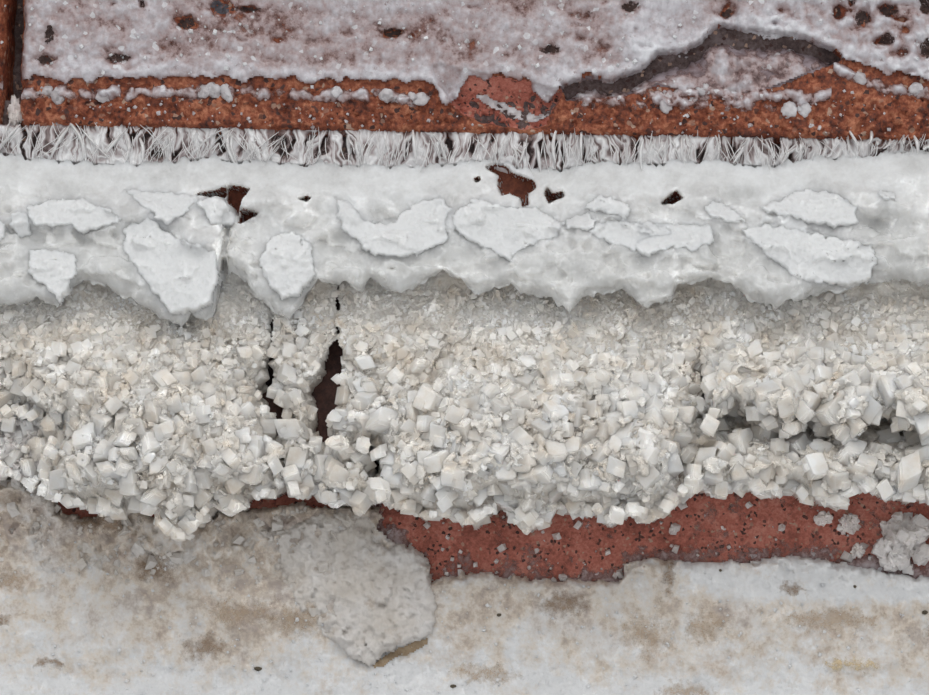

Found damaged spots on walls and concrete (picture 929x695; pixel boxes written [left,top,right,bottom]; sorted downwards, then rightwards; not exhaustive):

spalling [919,0,929,14]
water stain [21,0,929,122]
spalling [539,44,560,54]
spalling [648,53,716,89]
spalling [878,33,895,44]
spalling [920,38,929,58]
spalling [452,74,578,130]
water stain [22,122,68,161]
water stain [50,126,82,164]
water stain [77,125,132,165]
water stain [144,126,233,164]
water stain [0,261,929,695]